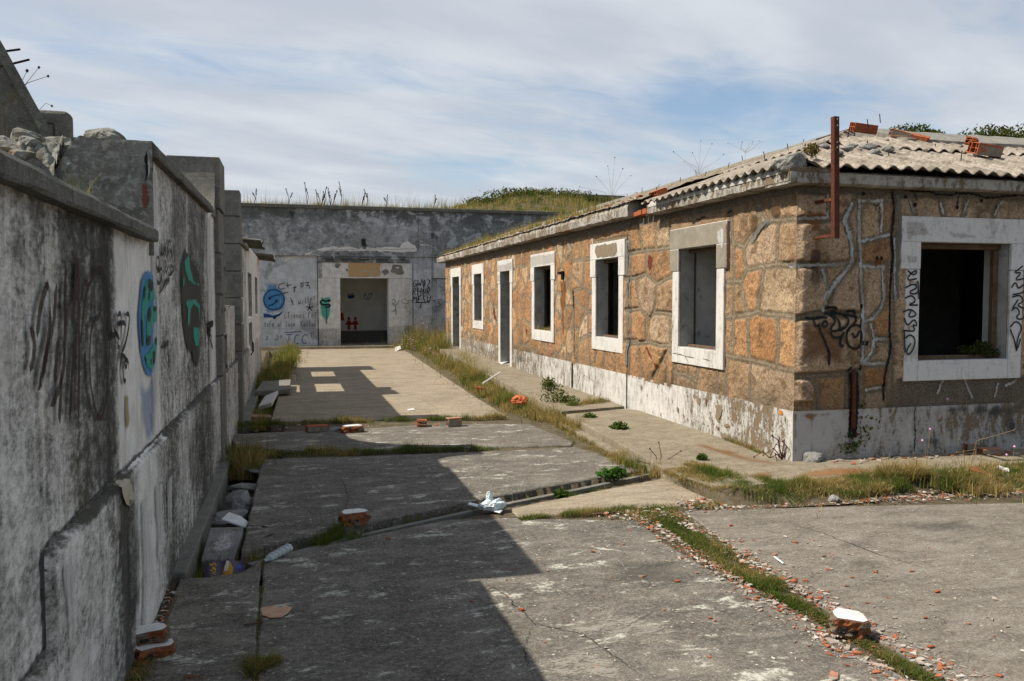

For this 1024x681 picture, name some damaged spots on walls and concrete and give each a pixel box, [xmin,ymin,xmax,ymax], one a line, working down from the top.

rust [806,212,822,230]
damp [88,222,130,497]
peeling [677,393,746,445]